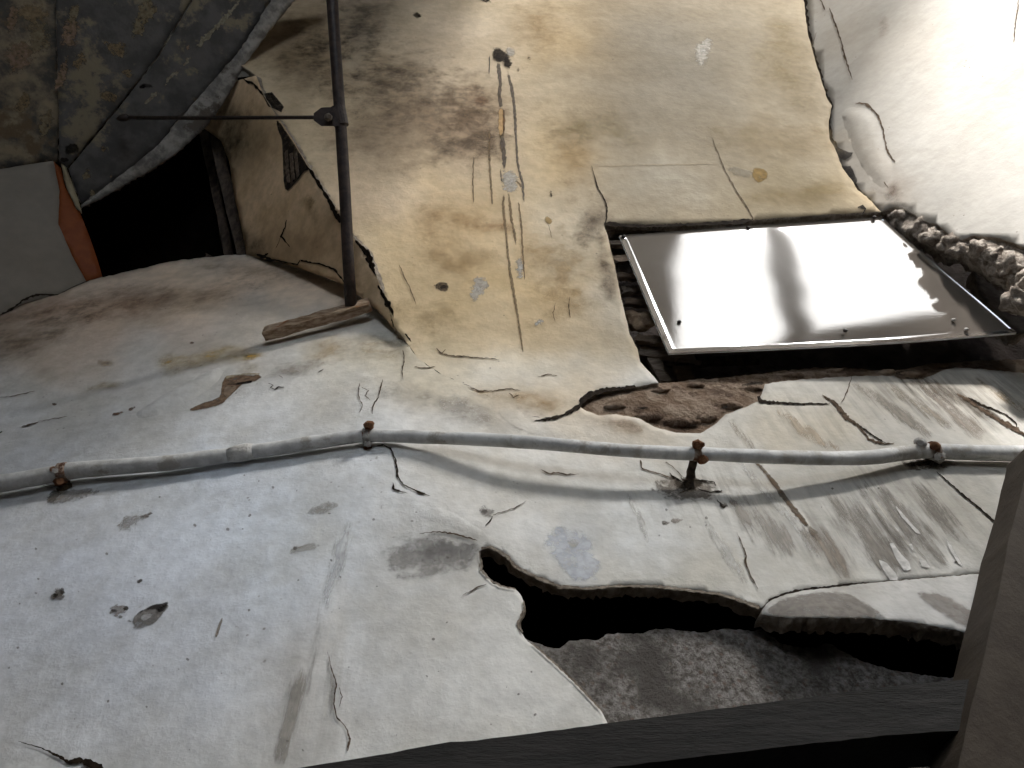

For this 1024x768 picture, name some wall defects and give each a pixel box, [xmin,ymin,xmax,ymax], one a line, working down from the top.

water stain [442,57,525,351]
spalling [887,209,1024,292]
flaking render [190,373,261,411]
flaking render [581,359,1024,433]
crack [757,376,893,445]
crack [377,444,430,496]
spalling [479,545,960,712]
crack [327,652,351,751]
crack [18,741,103,768]